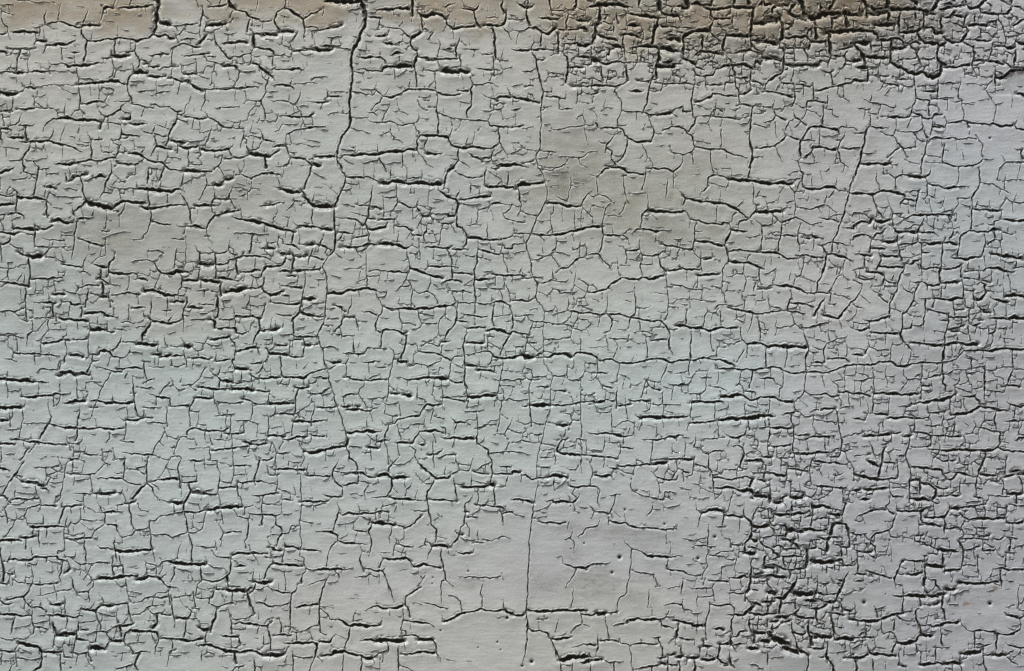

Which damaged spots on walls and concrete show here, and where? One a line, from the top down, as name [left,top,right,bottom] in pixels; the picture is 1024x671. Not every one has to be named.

crack [42,34,81,60]
crack [253,61,276,81]
crack [11,220,53,233]
crack [42,245,91,276]
crack [0,331,70,365]
crack [0,372,71,407]
crack [125,457,162,503]
crack [579,493,679,554]
crack [555,555,611,588]
crack [925,553,947,573]
crack [613,600,719,663]
crack [918,646,944,671]